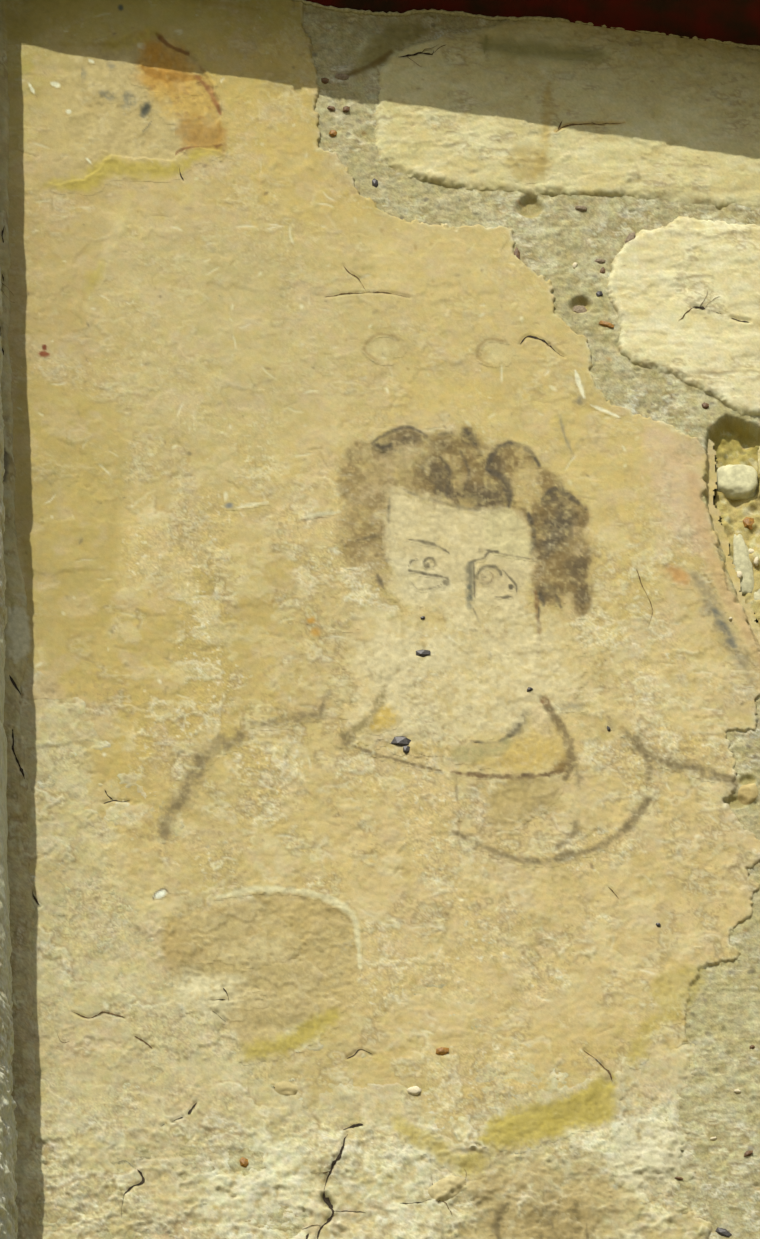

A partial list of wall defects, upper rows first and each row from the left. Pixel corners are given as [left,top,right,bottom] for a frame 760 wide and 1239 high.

rust [127,34,232,162]
peeling [572,368,622,418]
peeling [391,736,411,754]
crack [303,1123,365,1239]
flaking render [412,1117,695,1239]